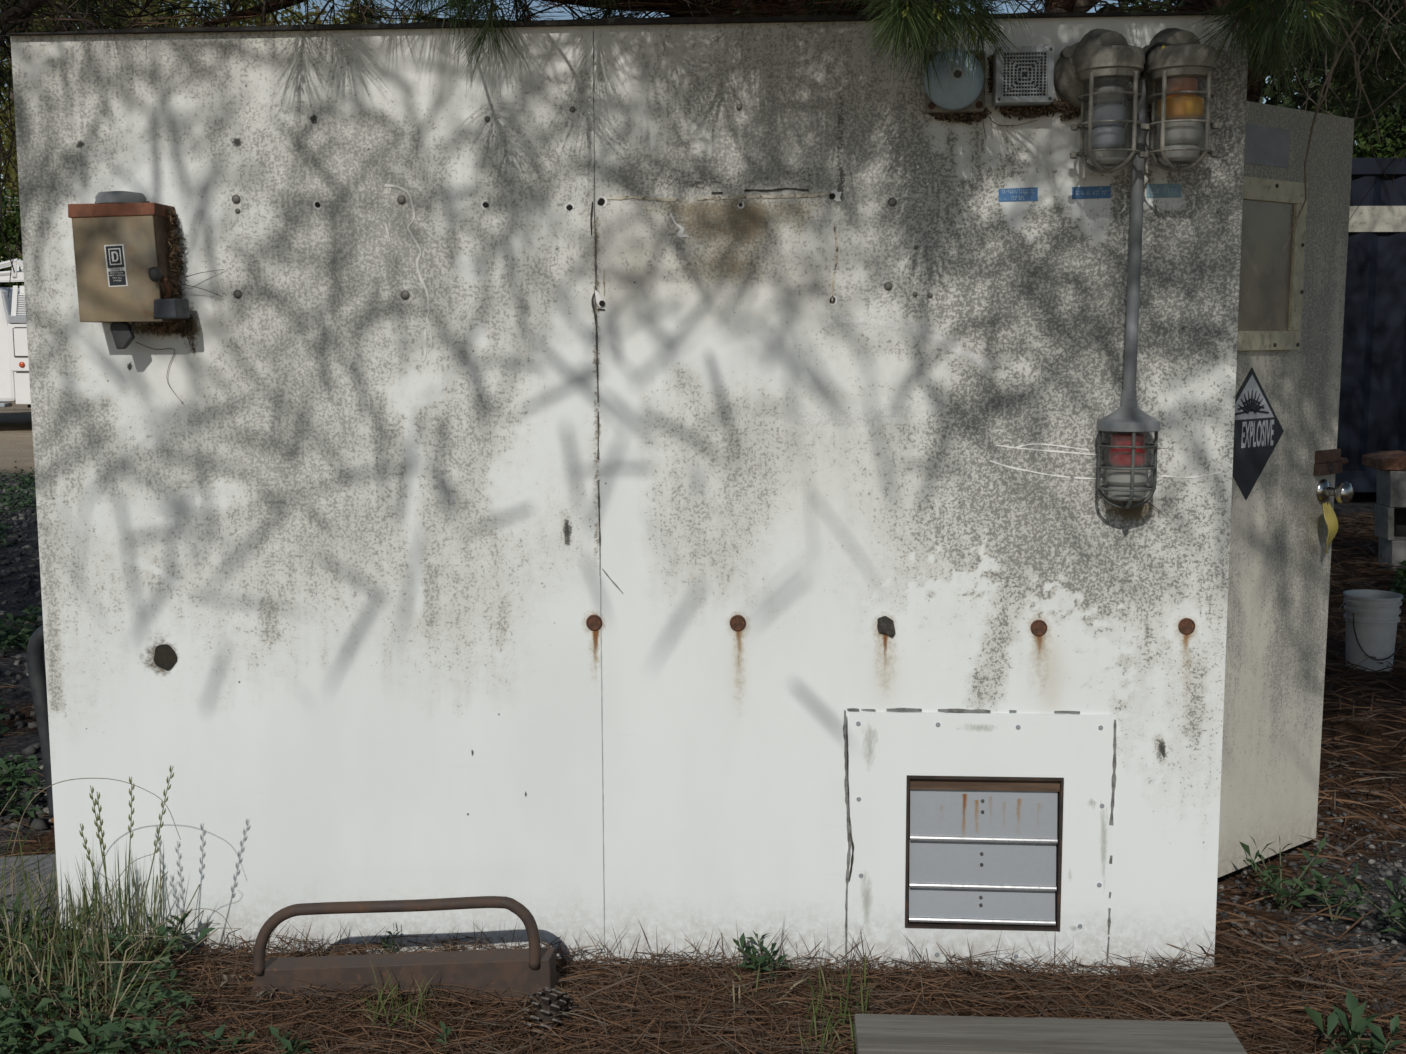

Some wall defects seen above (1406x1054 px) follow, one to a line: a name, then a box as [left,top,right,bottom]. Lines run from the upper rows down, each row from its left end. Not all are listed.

leakage [836,93,846,200]
leakage [634,169,810,277]